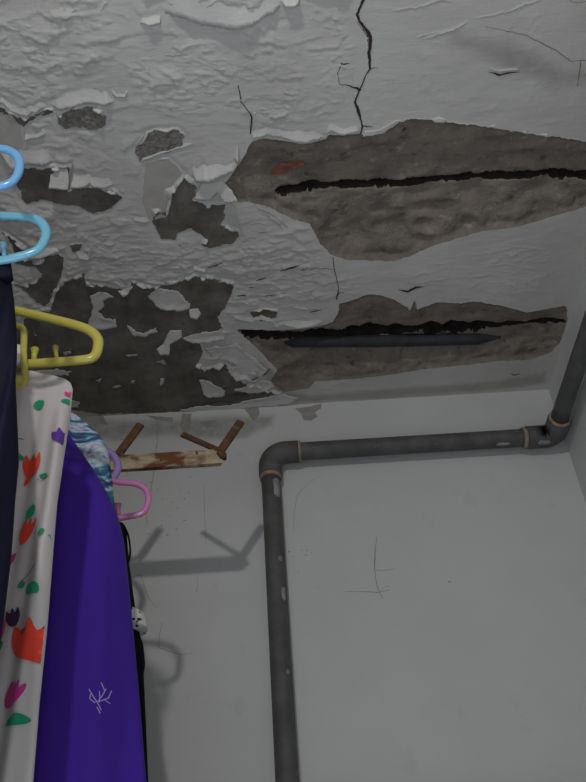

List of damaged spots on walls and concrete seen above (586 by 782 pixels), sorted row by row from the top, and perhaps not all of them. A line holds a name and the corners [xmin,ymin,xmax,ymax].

peeling [140,0,299,30]
crack [337,0,373,134]
peeling [0,88,128,215]
spalling [133,117,586,261]
peeling [3,231,568,433]